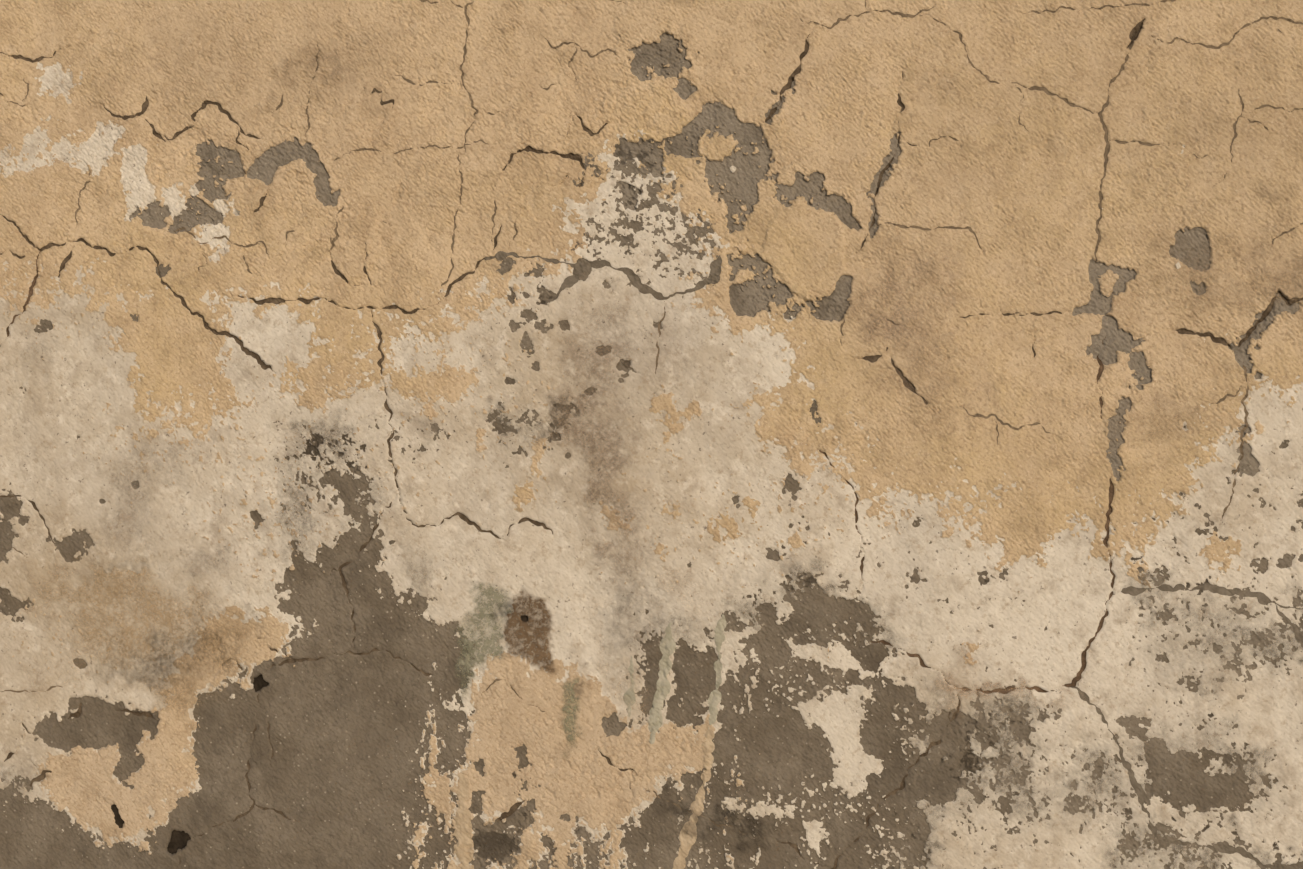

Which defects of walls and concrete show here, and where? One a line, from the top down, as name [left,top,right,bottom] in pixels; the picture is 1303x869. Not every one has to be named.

spalling [0,96,340,263]
crack [0,0,722,868]
spalling [628,32,699,100]
spalling [805,275,853,322]
crack [817,449,865,580]
crack [765,0,1303,264]
crack [1097,337,1106,419]
spalling [1072,259,1152,490]
spalling [1169,226,1211,295]
crack [1176,291,1303,518]
crack [777,476,1303,869]
peeling [468,778,557,869]